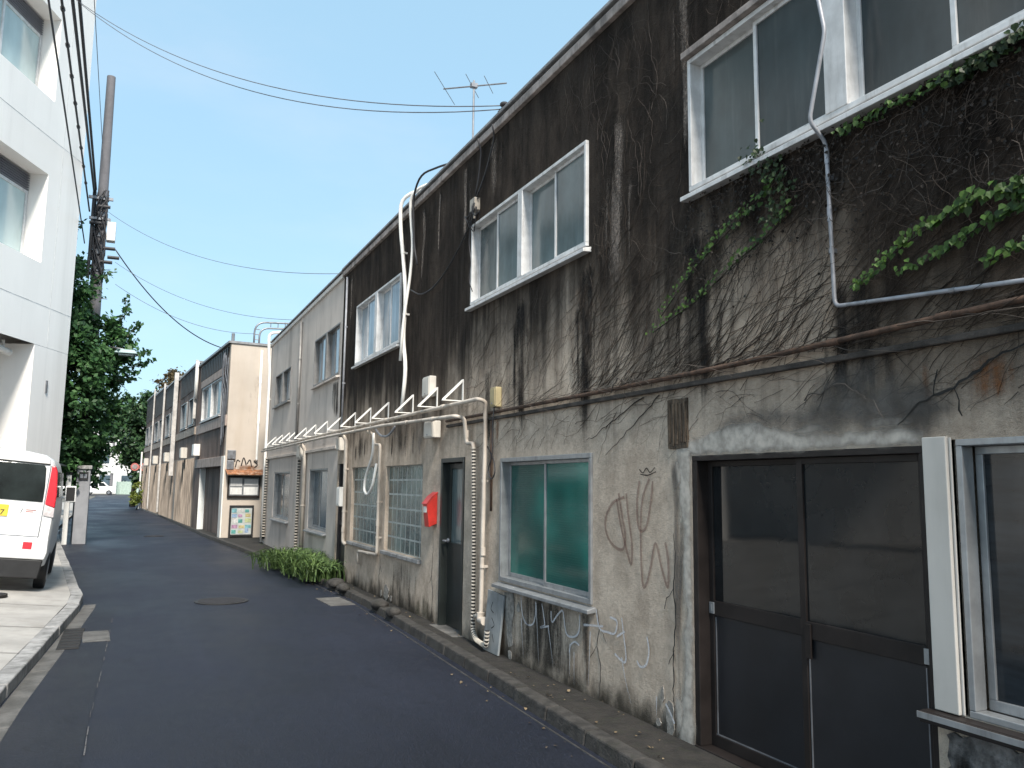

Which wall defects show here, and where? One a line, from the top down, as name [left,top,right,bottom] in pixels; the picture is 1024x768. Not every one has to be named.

damp [612,130,622,260]
damp [513,303,528,424]
damp [575,267,596,422]
damp [678,239,722,392]
crack [664,535,676,728]